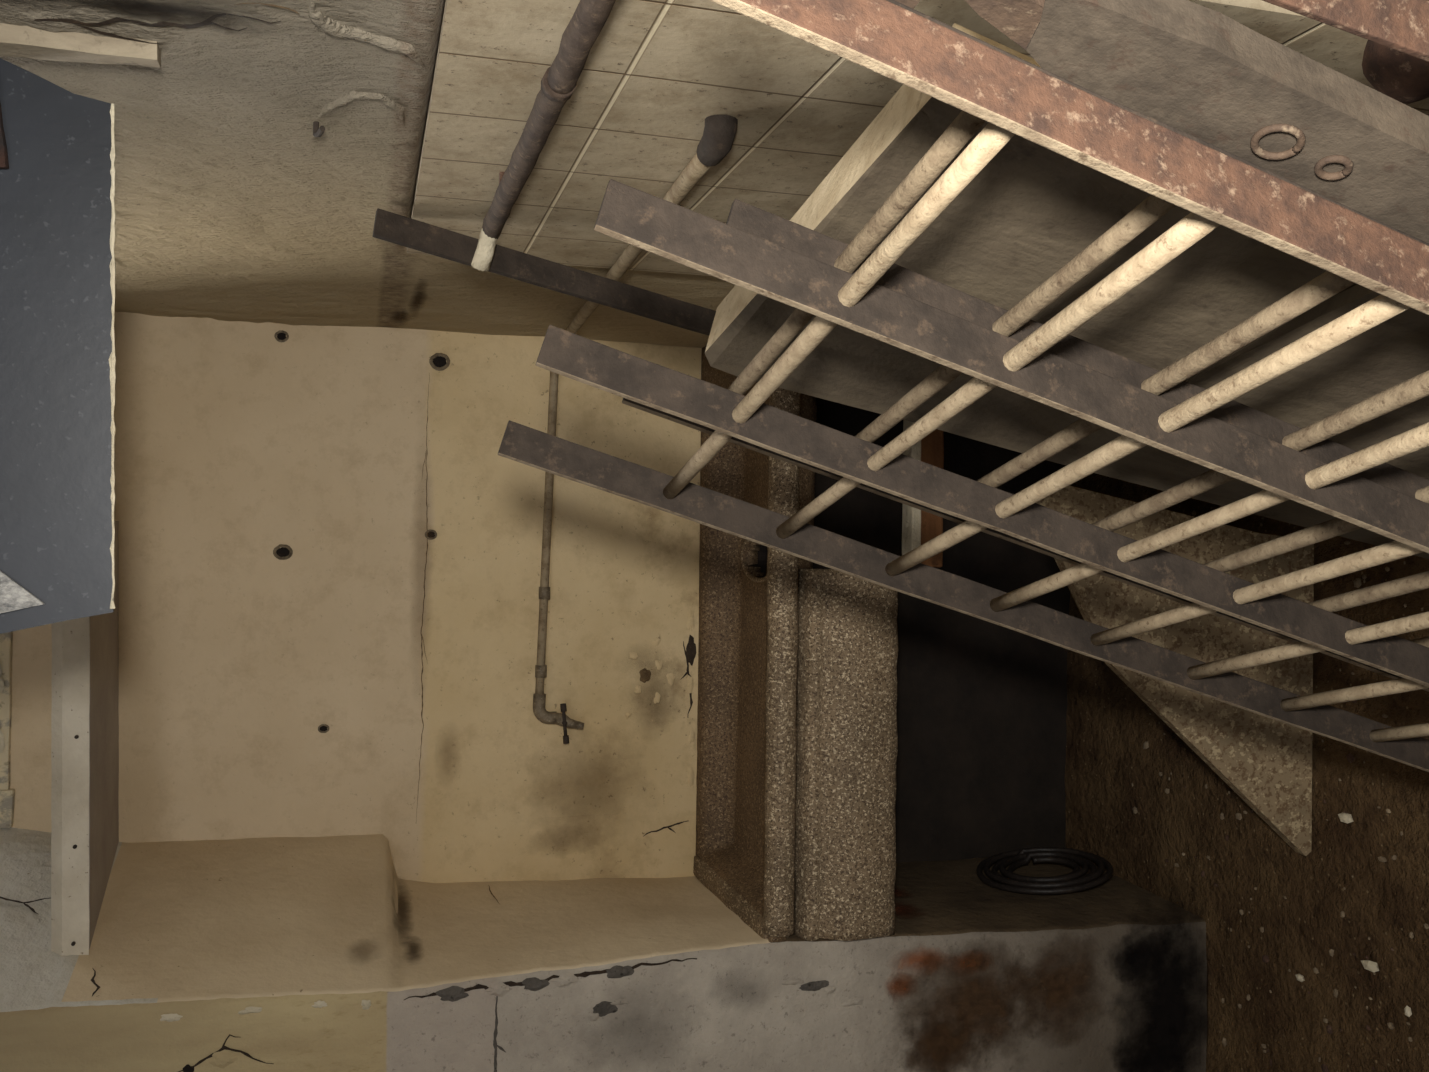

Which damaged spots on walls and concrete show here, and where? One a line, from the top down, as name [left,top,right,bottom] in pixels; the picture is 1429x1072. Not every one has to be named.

corrosion [1262,0,1429,104]
crack [0,896,51,914]
crack [178,1034,274,1072]
water stain [907,951,1091,1072]
water stain [1116,916,1209,1072]